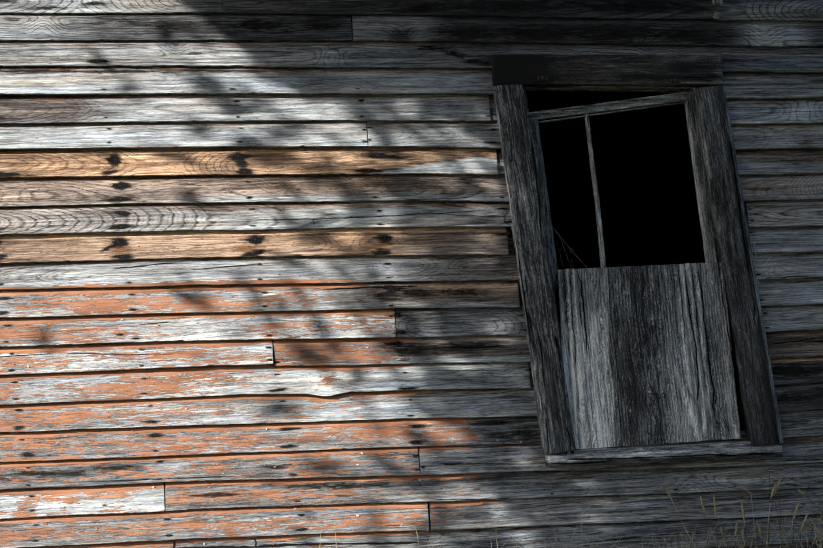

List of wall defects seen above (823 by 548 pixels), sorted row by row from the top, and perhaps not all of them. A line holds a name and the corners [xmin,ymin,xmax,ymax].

peeling [0,274,512,548]
damp [372,288,487,301]
crack [545,238,823,465]